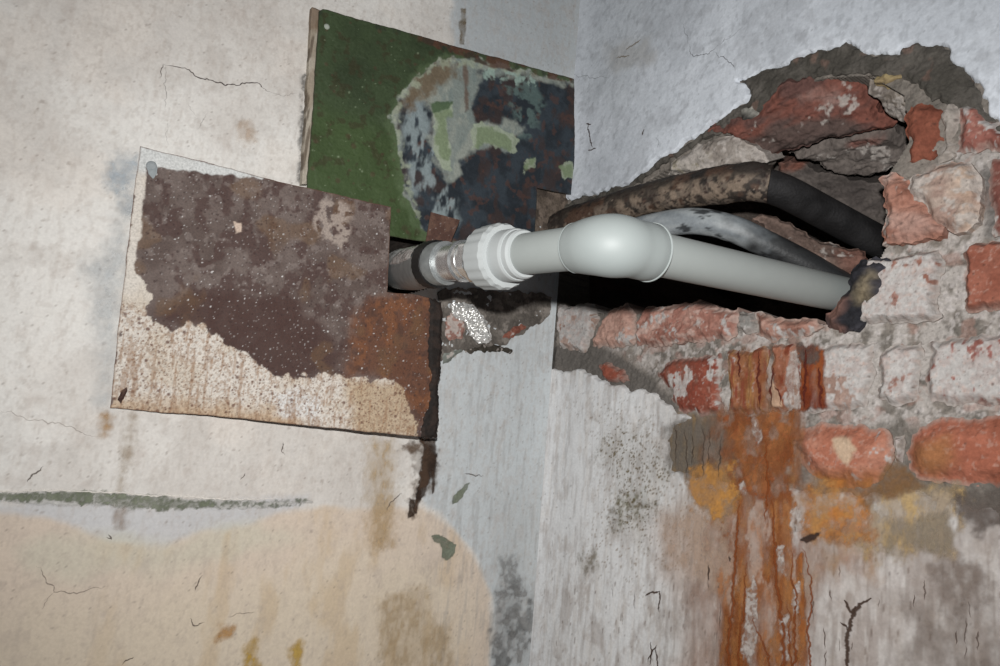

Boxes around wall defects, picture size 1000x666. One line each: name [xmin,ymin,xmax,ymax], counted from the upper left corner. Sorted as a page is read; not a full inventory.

crack [160,65,266,90]
spalling [387,42,1000,508]
corrosion [688,342,964,666]